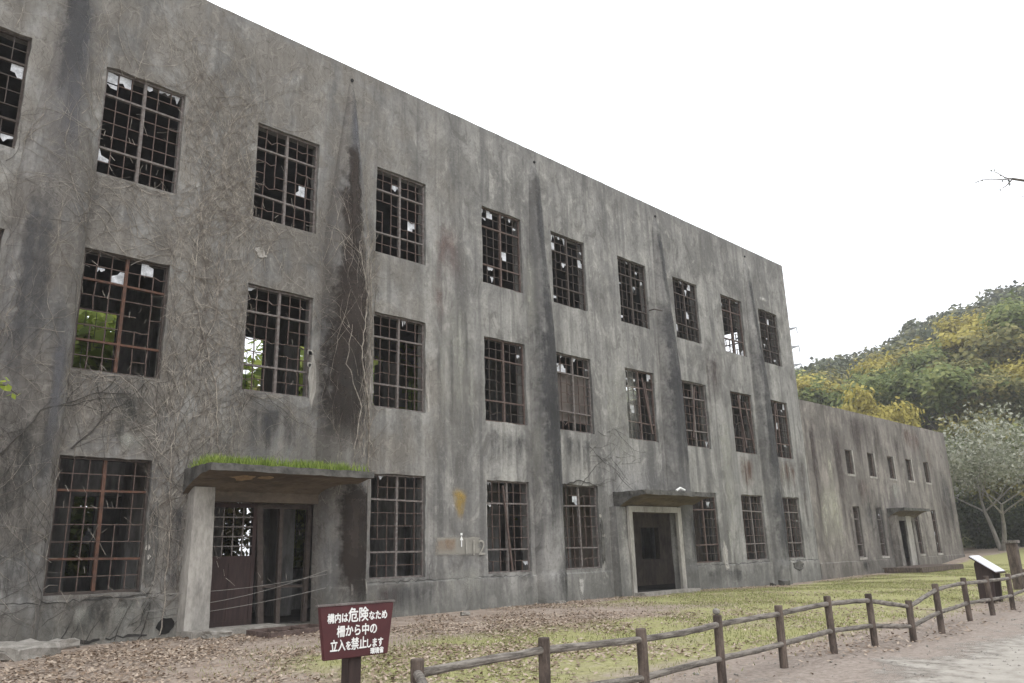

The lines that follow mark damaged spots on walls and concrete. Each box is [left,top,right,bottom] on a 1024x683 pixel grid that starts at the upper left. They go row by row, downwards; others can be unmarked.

water stain [64,0,91,134]
water stain [12,213,52,346]
water stain [321,111,368,422]
water stain [538,192,546,260]
water stain [537,286,563,495]